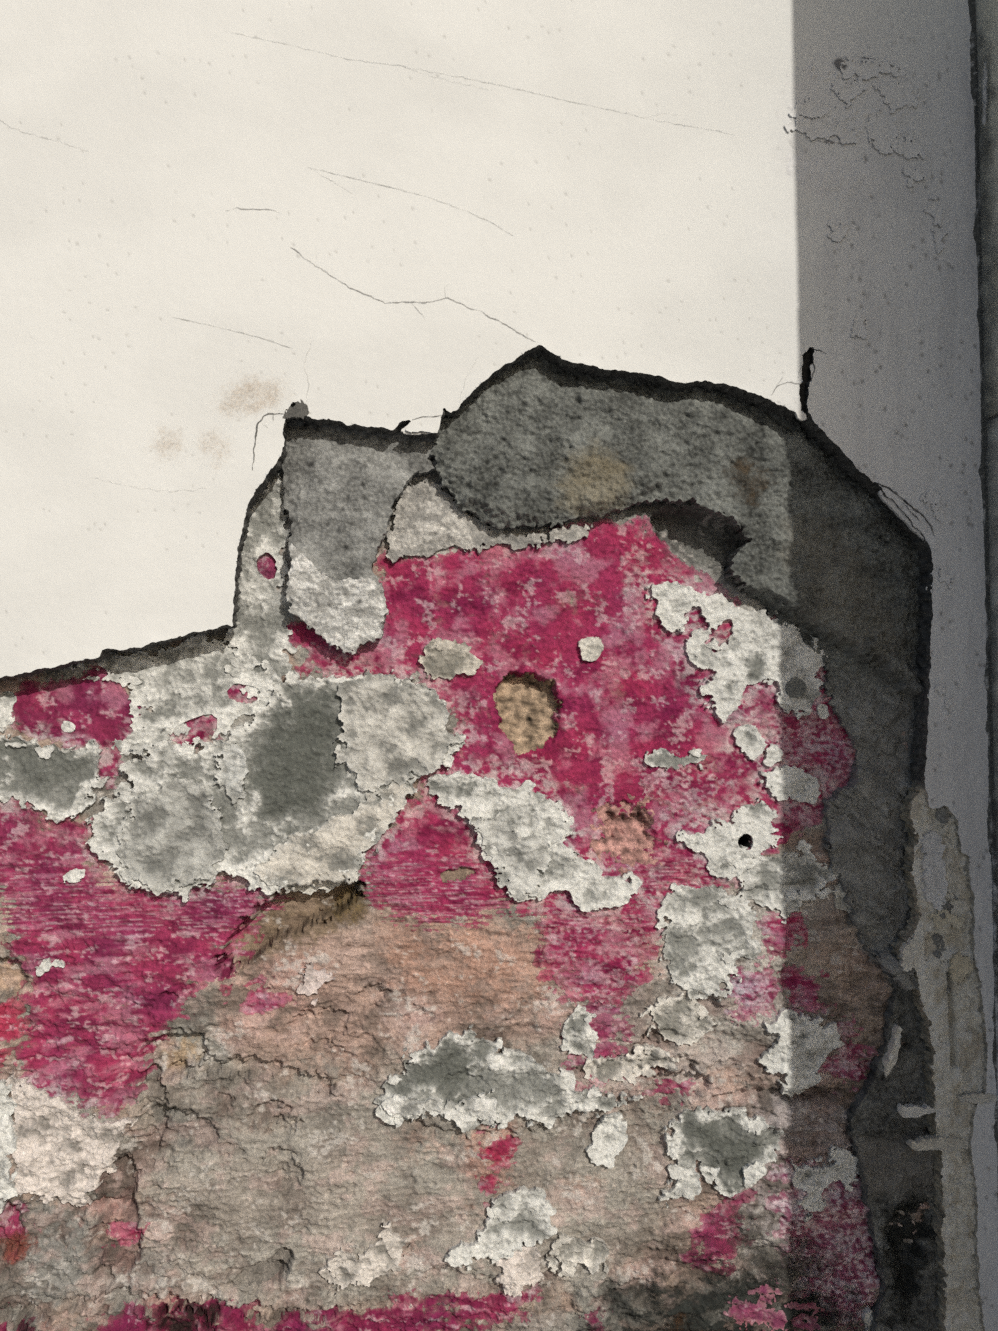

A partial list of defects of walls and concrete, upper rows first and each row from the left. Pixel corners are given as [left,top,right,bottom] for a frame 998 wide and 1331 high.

peeling [776,46,933,198]
crack [290,247,527,338]
spalling [0,345,998,1331]